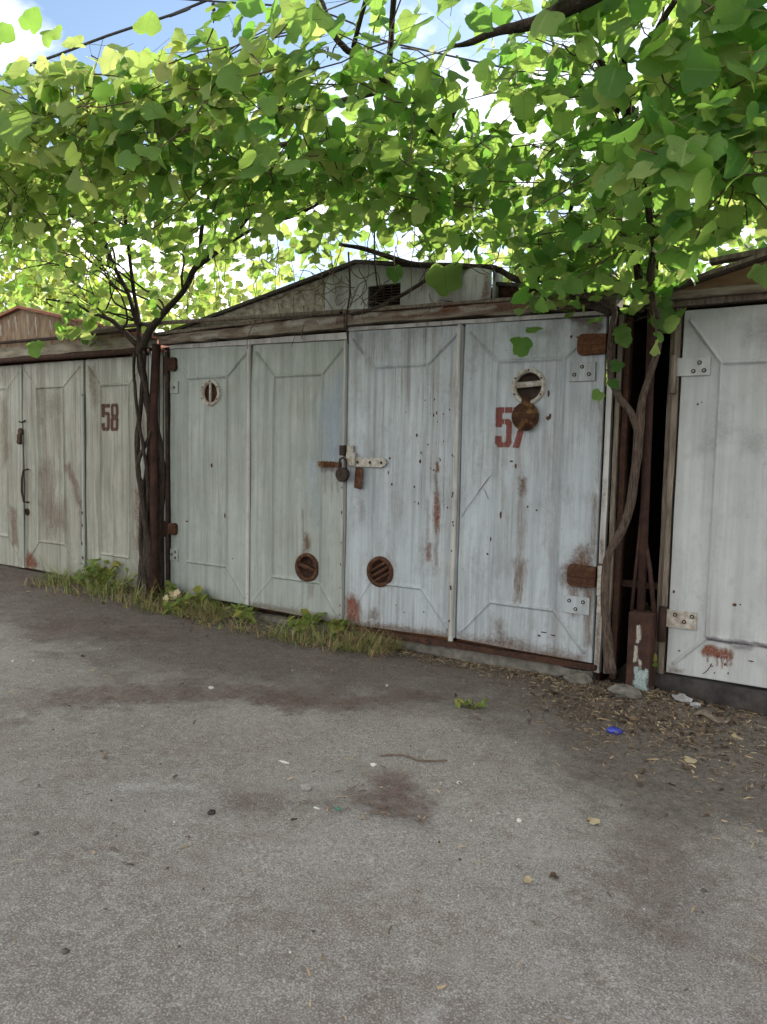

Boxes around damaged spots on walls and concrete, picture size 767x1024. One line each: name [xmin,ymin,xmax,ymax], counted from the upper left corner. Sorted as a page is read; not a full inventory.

corrosion [345,597,448,639]
peeling [633,625,648,691]
corrosion [702,645,733,667]